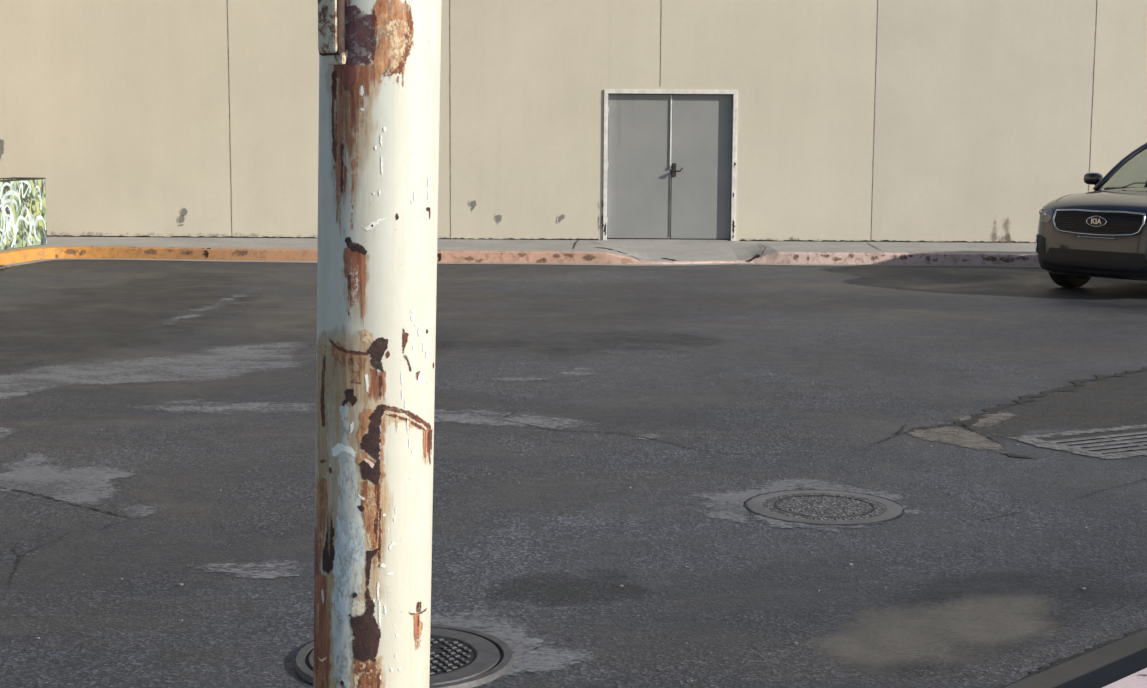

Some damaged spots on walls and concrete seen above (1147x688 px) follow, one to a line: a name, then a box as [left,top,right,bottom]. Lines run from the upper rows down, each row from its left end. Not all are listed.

rust [319,0,414,323]
spalling [794,252,912,261]
rust [402,329,412,372]
peeling [401,309,430,453]
crack [871,367,1147,458]
crack [1,487,131,531]
rust [313,329,387,688]
peeling [314,330,403,688]